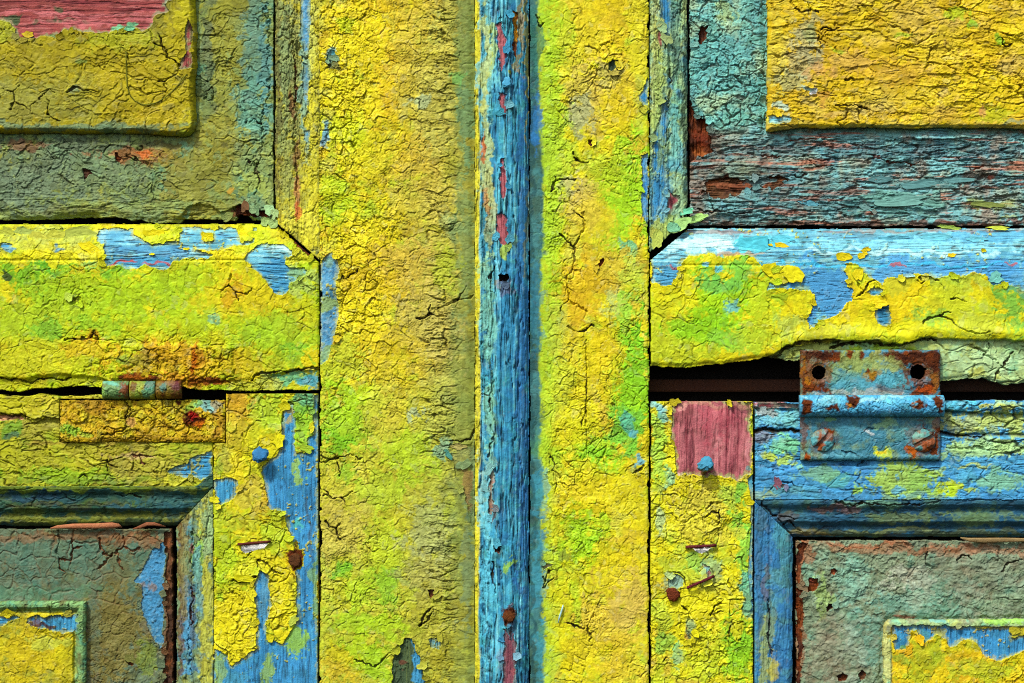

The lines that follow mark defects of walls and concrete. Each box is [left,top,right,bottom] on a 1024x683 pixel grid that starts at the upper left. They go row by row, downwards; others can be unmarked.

crack [794,1,838,44]
crack [5,86,97,121]
peeling [0,200,341,365]
crack [415,292,463,320]
peeling [649,175,1024,331]
rust [799,350,878,446]
rust [880,350,945,460]
peeling [213,394,321,683]
crack [320,455,361,541]
peeling [134,530,176,683]
rust [501,602,518,640]
peeling [886,623,1024,661]